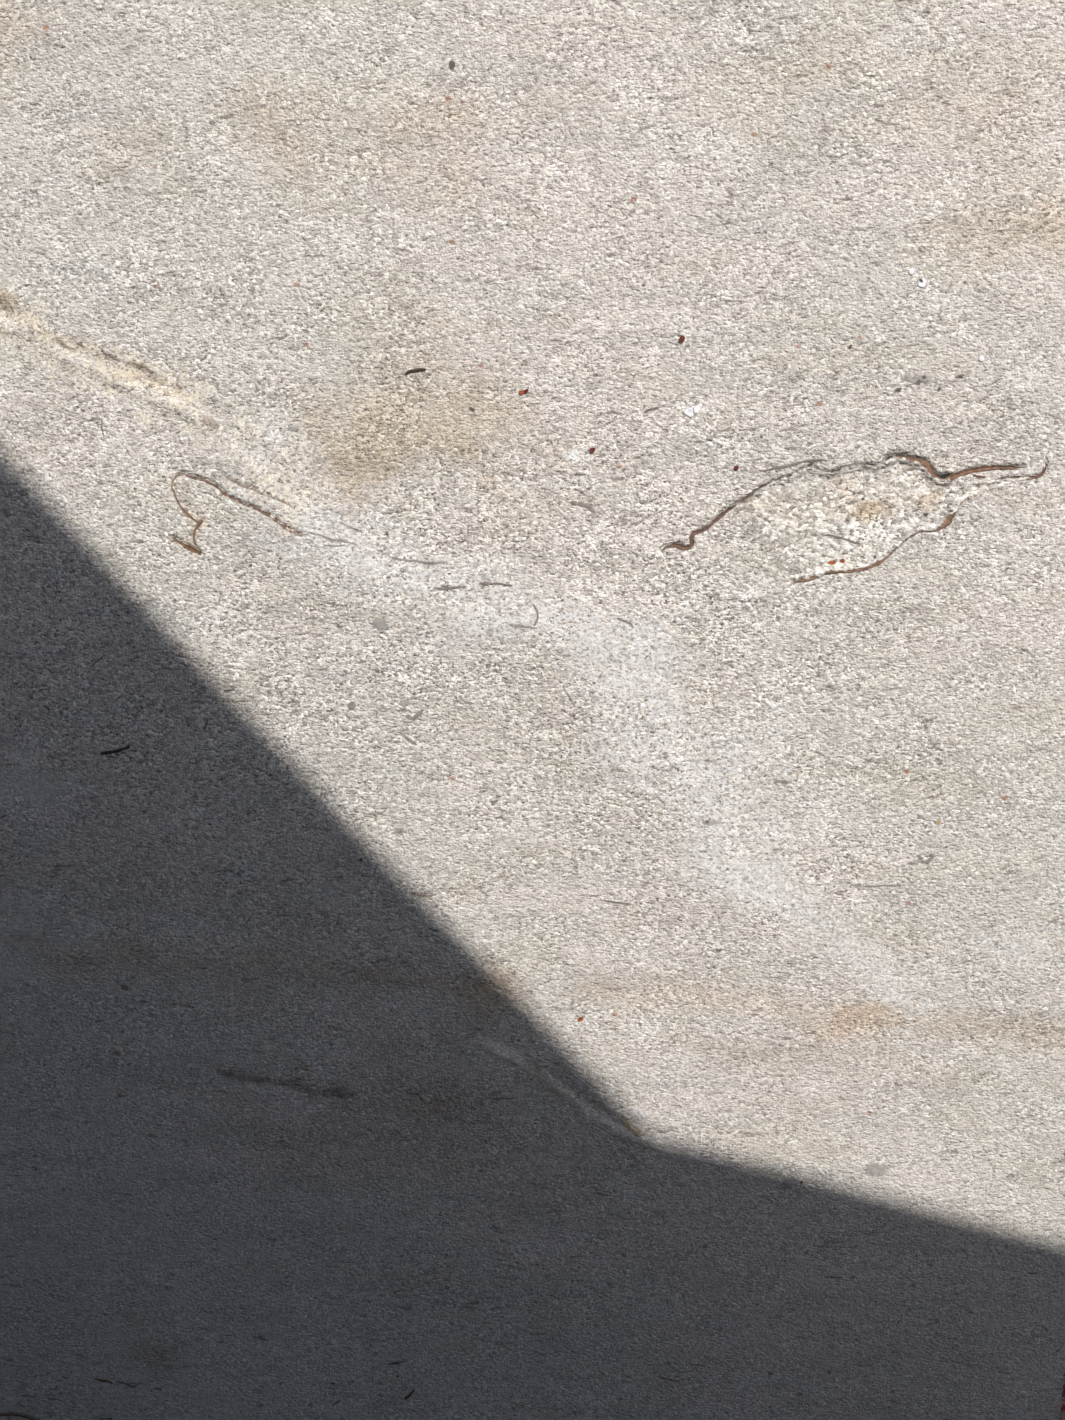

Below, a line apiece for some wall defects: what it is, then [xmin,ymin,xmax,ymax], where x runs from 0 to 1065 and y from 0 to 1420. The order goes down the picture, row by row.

crack [171,470,448,565]